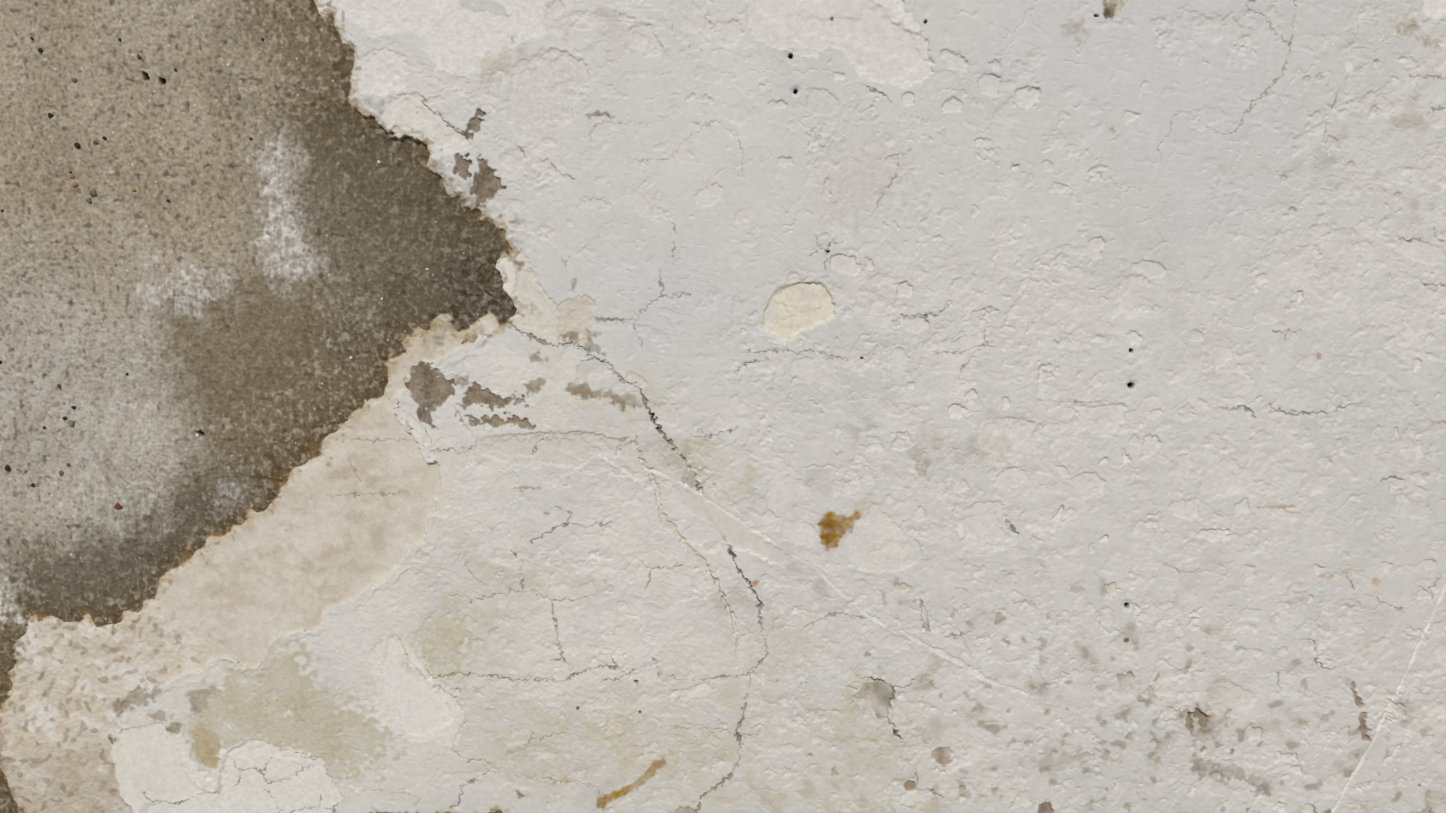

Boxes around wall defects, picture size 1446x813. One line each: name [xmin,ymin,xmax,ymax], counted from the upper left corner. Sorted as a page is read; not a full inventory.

water stain [472,47,527,94]
peeling [745,0,935,106]
water stain [0,88,524,690]
spalling [0,0,596,813]
crack [325,405,475,499]
crack [507,224,740,494]
crack [723,537,881,629]
corrosion [817,493,874,552]
peeling [845,503,926,573]
crack [323,506,809,813]
corrosion [597,760,659,813]
peeling [932,747,955,769]